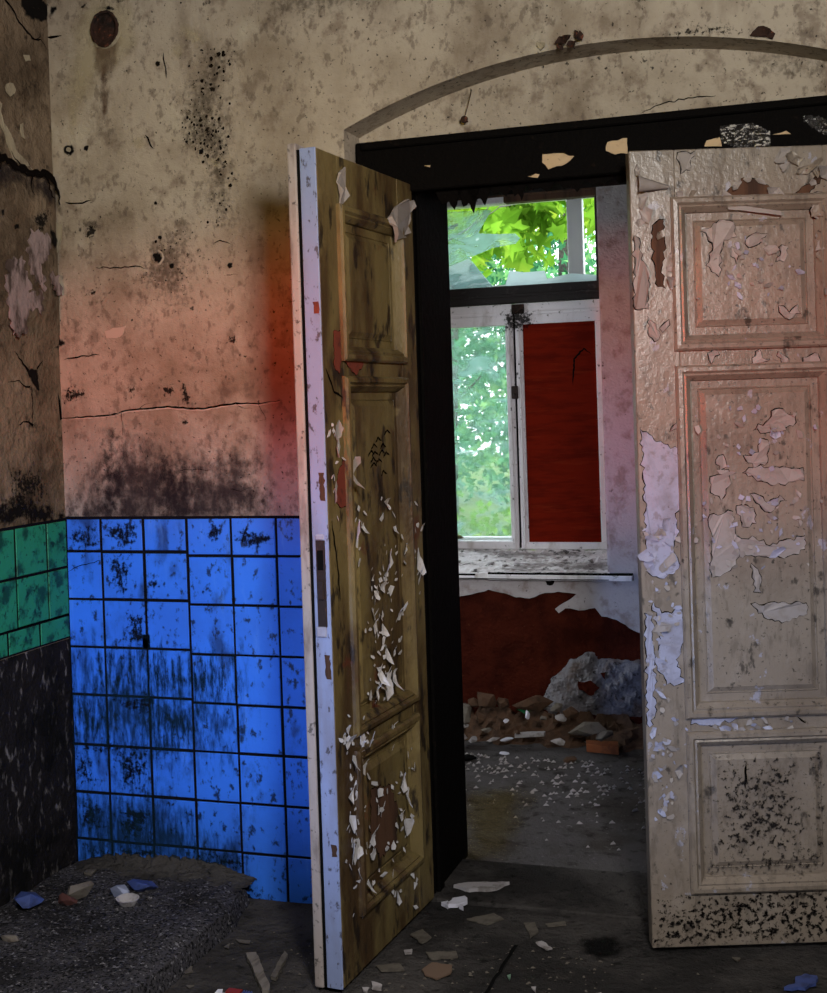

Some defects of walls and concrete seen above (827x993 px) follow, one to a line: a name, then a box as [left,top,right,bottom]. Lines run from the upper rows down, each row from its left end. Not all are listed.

water stain [181,48,233,187]
crack [0,153,91,205]
peeling [529,153,574,178]
peeling [606,138,628,154]
peeling [4,222,63,338]
crack [62,400,280,434]
water stain [67,520,142,593]
water stain [235,528,270,548]
peeling [702,404,809,623]
spalling [460,429,773,821]
water stain [75,743,147,791]
crack [484,945,518,993]